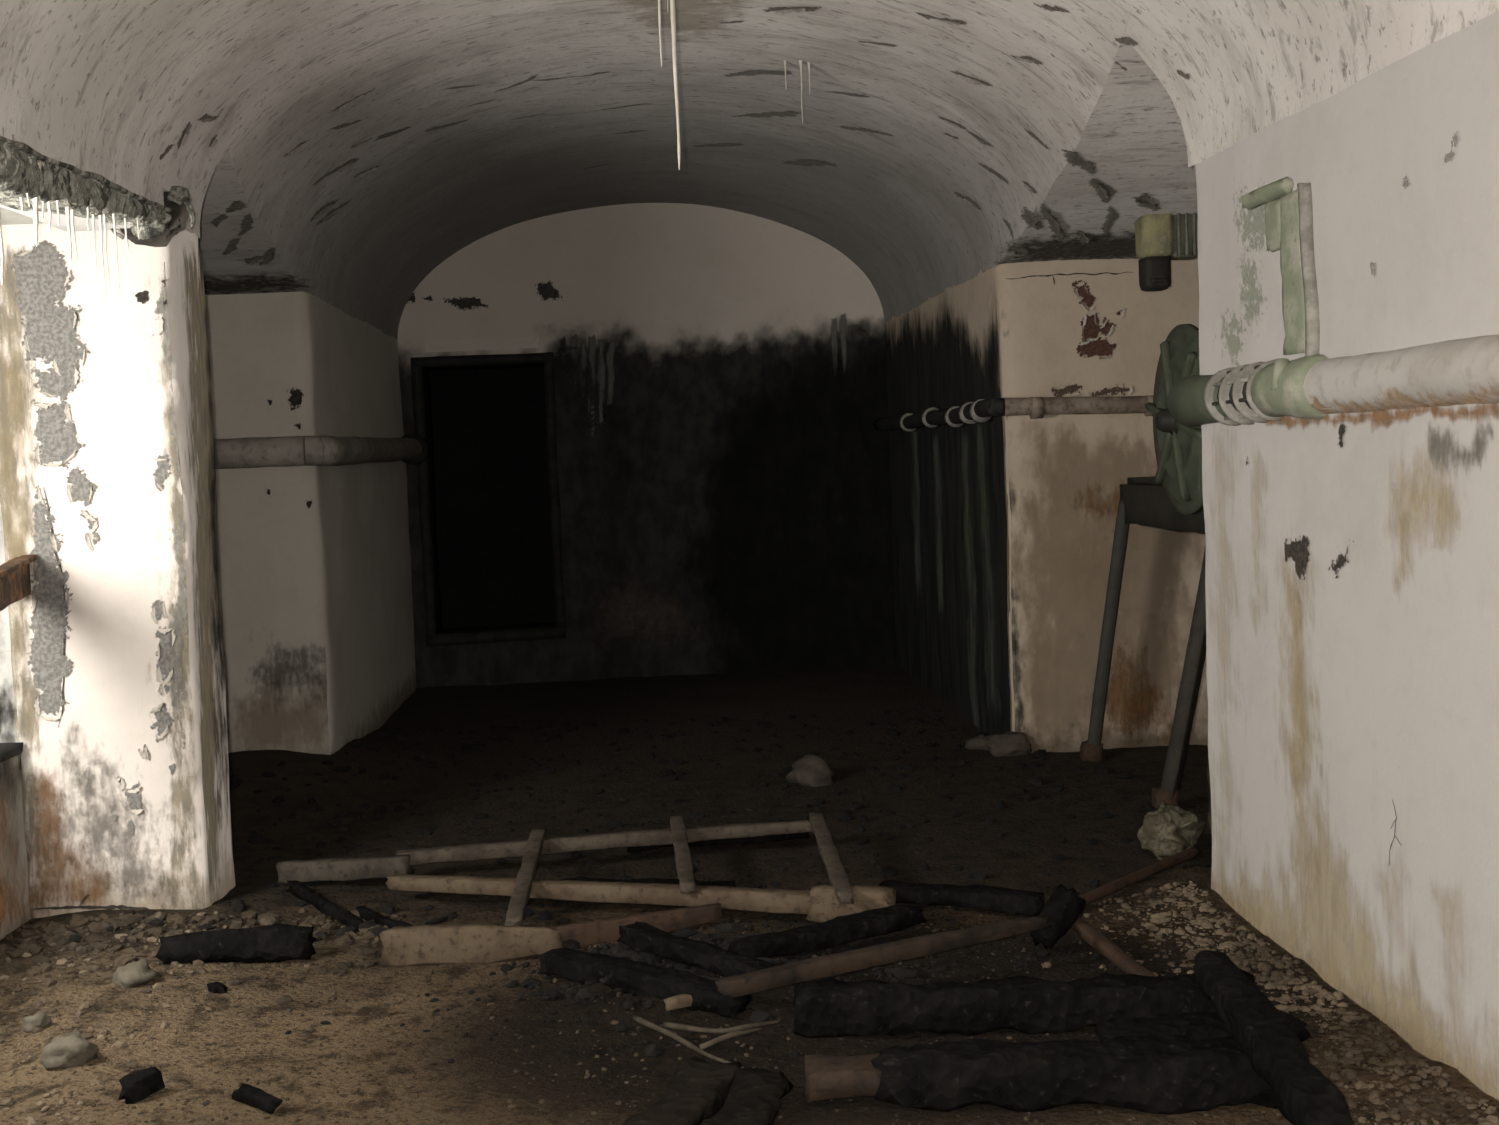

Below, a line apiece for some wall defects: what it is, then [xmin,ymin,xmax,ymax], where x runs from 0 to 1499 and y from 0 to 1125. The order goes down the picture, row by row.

water stain [0,251,37,576]
peeling [28,485,74,721]
peeling [10,240,100,551]
water stain [70,254,307,910]
peeling [407,293,489,310]
water stain [406,311,1023,736]
peeling [1071,280,1125,359]
spalling [1284,535,1310,580]
spalling [1329,540,1354,578]
corrosion [1266,387,1499,428]
water stain [1430,435,1484,462]
water stain [0,595,43,907]